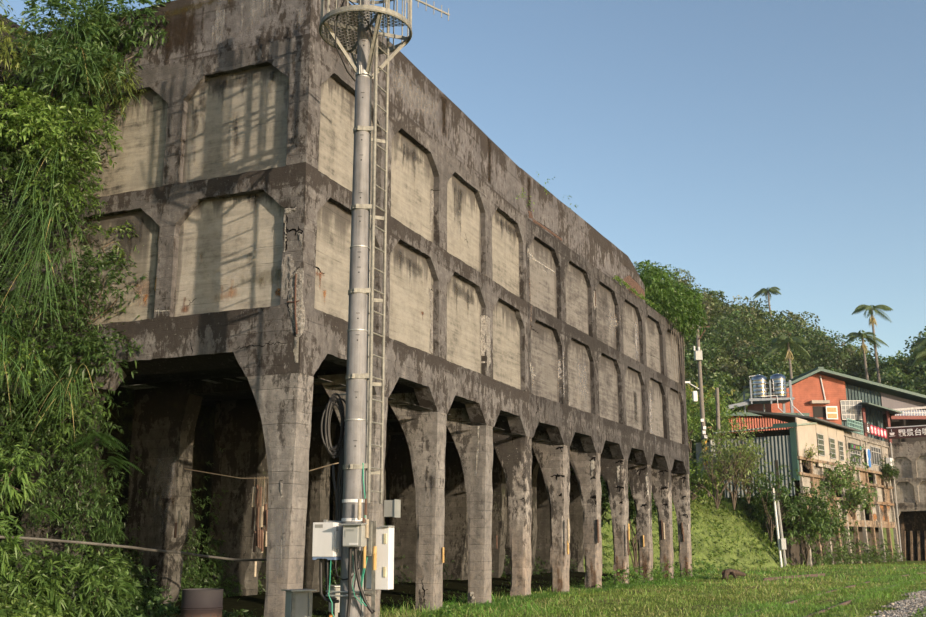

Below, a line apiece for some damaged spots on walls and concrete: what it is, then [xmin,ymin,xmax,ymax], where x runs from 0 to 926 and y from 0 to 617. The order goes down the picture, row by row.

spalling [281,207,305,363]
crack [284,215,303,253]